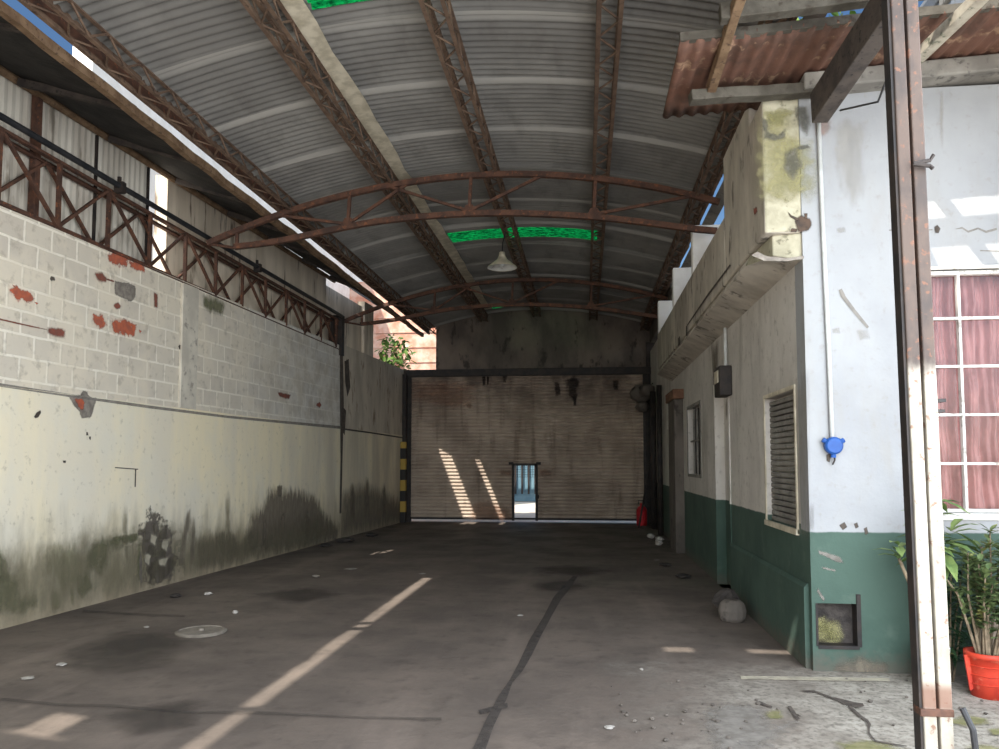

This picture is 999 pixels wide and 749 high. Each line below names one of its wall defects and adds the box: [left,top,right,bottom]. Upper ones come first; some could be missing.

water stain [763,119,785,140]
water stain [796,107,809,131]
water stain [784,145,809,178]
peeling [10,285,38,304]
peeling [93,314,141,337]
spalling [70,391,96,418]
water stain [179,483,400,565]